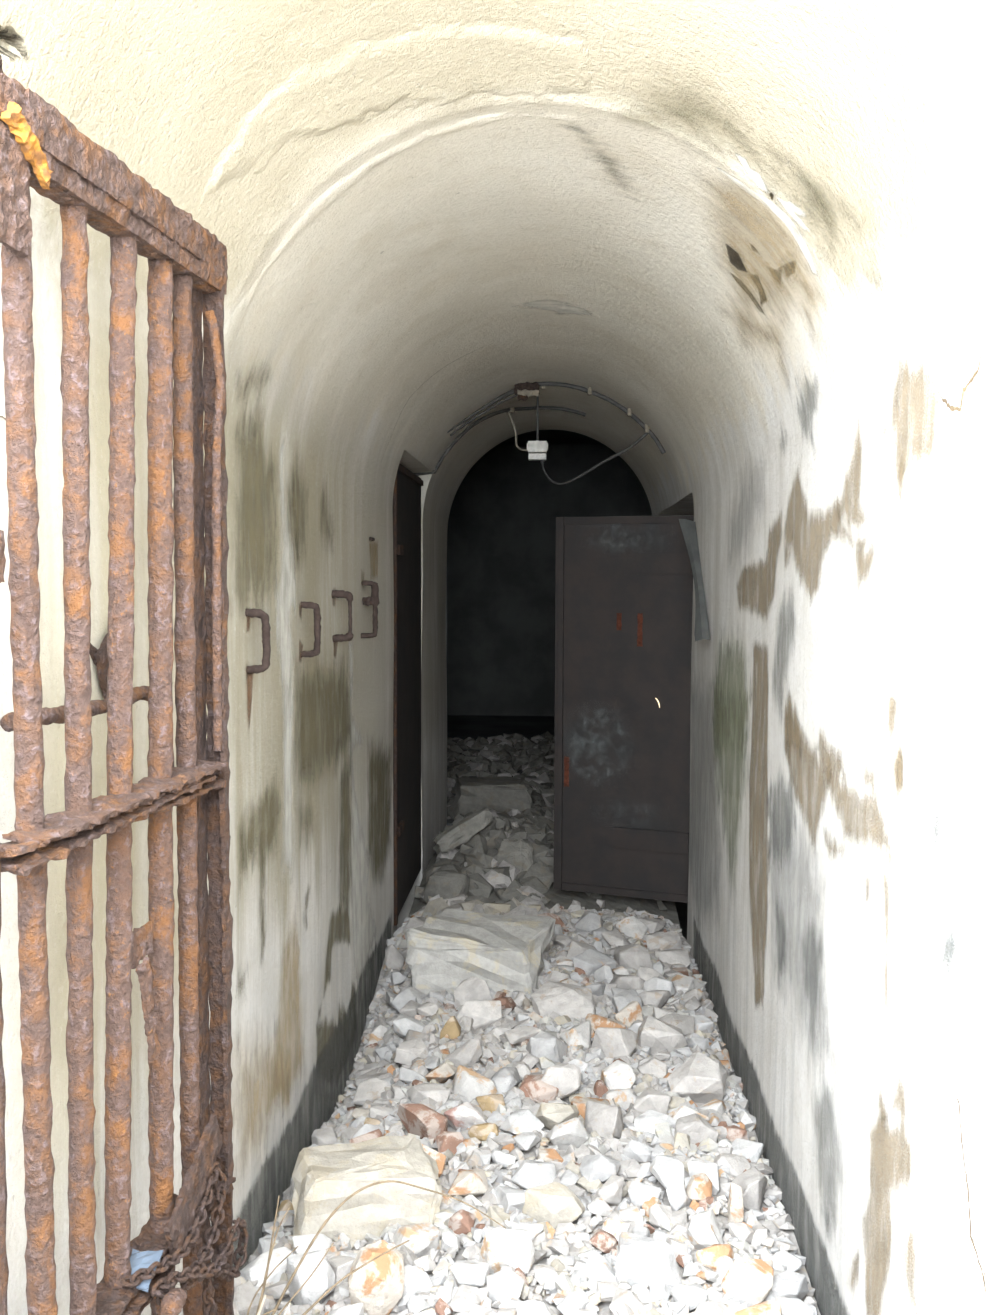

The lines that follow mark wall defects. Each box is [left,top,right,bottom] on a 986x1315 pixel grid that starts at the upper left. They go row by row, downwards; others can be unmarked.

hole [0,30,28,59]
peeling [719,154,817,312]
water stain [799,381,815,440]
water stain [883,362,939,500]
crack [938,351,983,413]
water stain [716,431,891,1010]
water stain [887,681,903,791]
water stain [233,417,392,1271]
water stain [693,921,911,1315]
water stain [906,1233,914,1298]